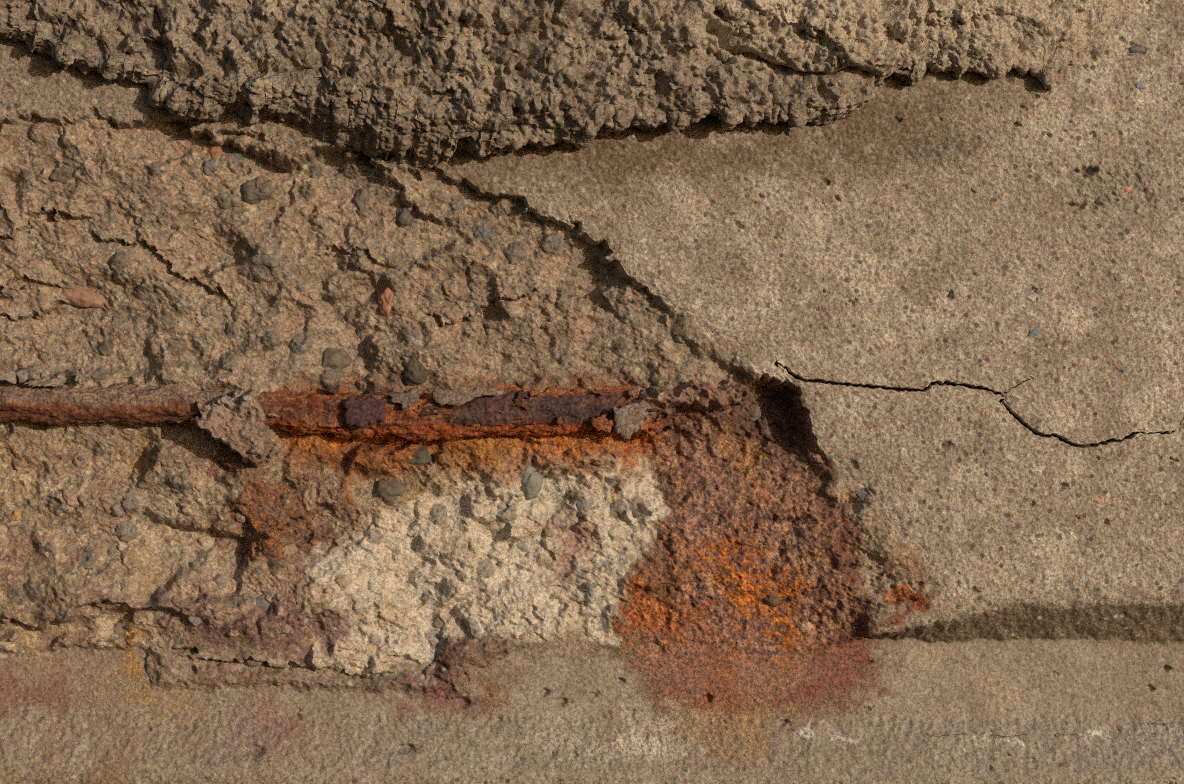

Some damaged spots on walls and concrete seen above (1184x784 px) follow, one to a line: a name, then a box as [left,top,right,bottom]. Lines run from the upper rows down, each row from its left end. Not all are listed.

spalling [0,107,945,699]
rust [283,373,930,762]
crack [776,361,1184,451]